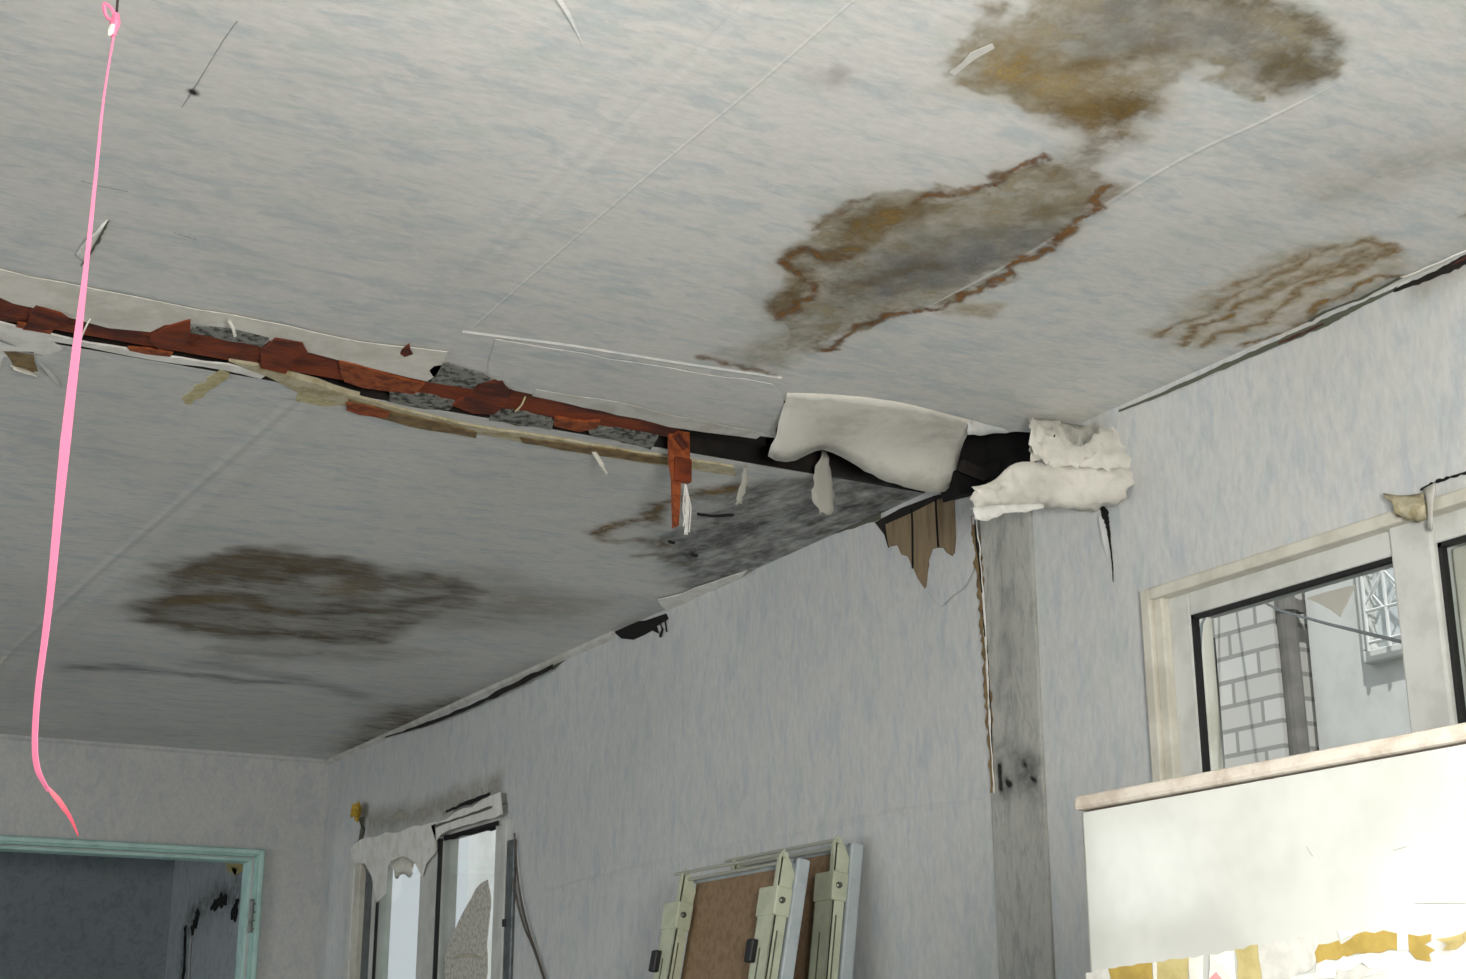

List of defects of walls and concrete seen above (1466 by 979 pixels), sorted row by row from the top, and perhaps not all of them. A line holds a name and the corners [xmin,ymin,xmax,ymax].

water stain [949,0,1343,139]
peeling [0,333,63,366]
water stain [769,153,1112,352]
water stain [1160,240,1400,346]
crack [1119,250,1466,412]
crack [1420,471,1466,491]
mould [590,485,790,585]
water stain [139,550,468,644]